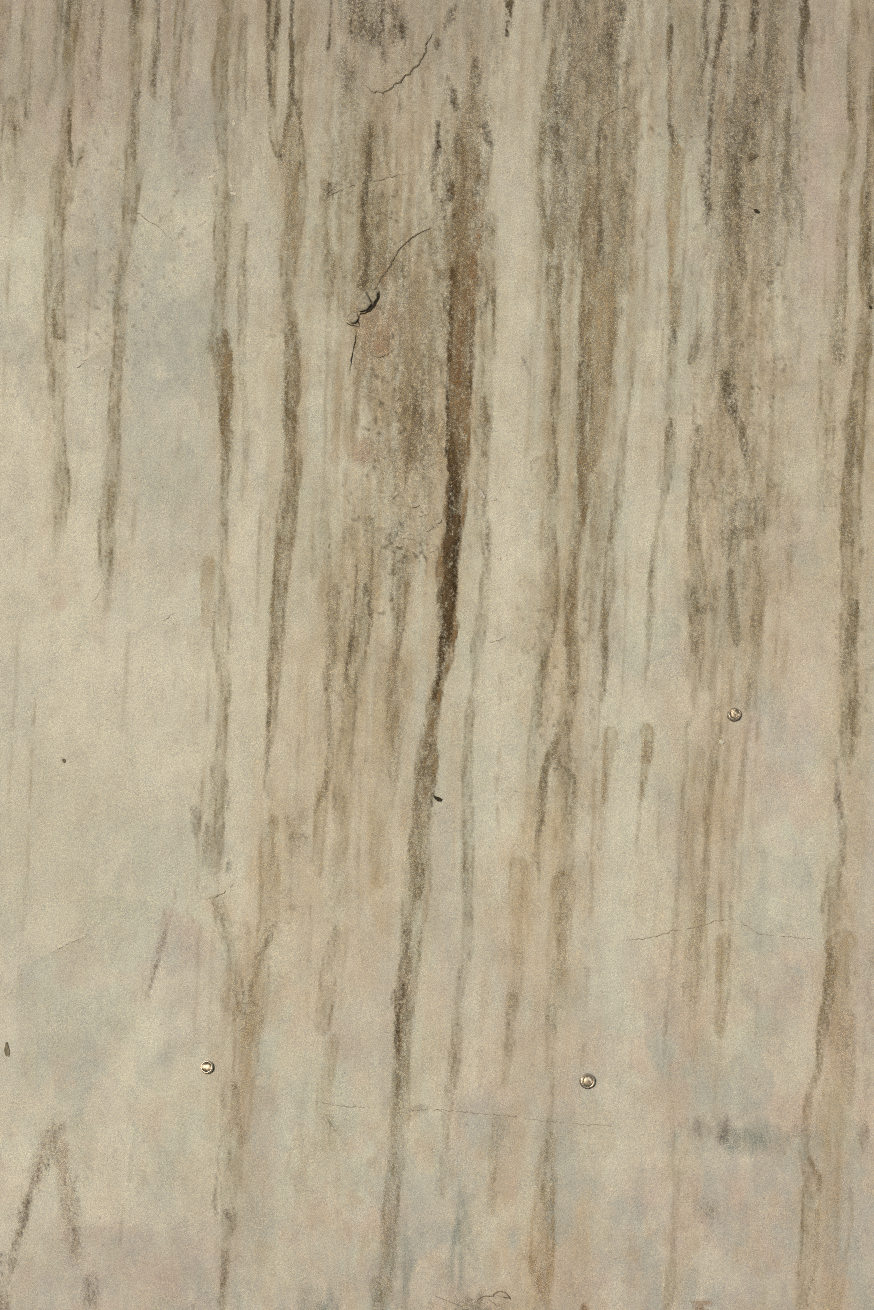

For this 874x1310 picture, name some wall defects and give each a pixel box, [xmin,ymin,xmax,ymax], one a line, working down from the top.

leakage [267,0,301,130]
crack [366,30,434,93]
leakage [667,0,728,72]
leakage [749,0,779,85]
leakage [798,0,810,84]
leakage [361,122,387,283]
crack [374,227,432,290]
leakage [211,334,232,448]
leakage [285,322,302,495]
flaking render [347,289,379,372]
leakage [577,194,613,540]
leakage [816,185,873,664]